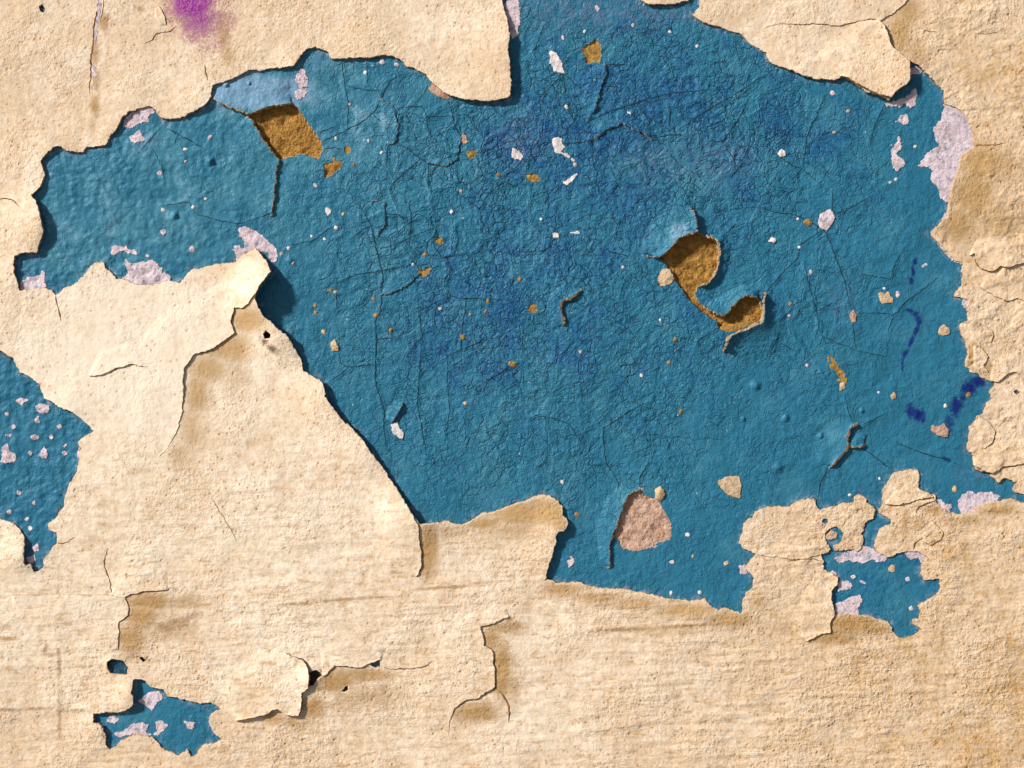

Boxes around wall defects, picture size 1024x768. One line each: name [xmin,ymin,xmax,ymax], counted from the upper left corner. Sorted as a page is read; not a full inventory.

crack [138,126,204,176]
crack [165,201,266,224]
crack [292,63,508,456]
peeling [14,0,1024,613]
crack [540,62,937,357]
peeling [0,351,93,571]
crack [536,391,650,486]
crack [845,397,956,468]
peeling [12,561,169,673]
peeling [791,527,940,642]
peeling [94,637,388,756]
crack [495,688,510,722]